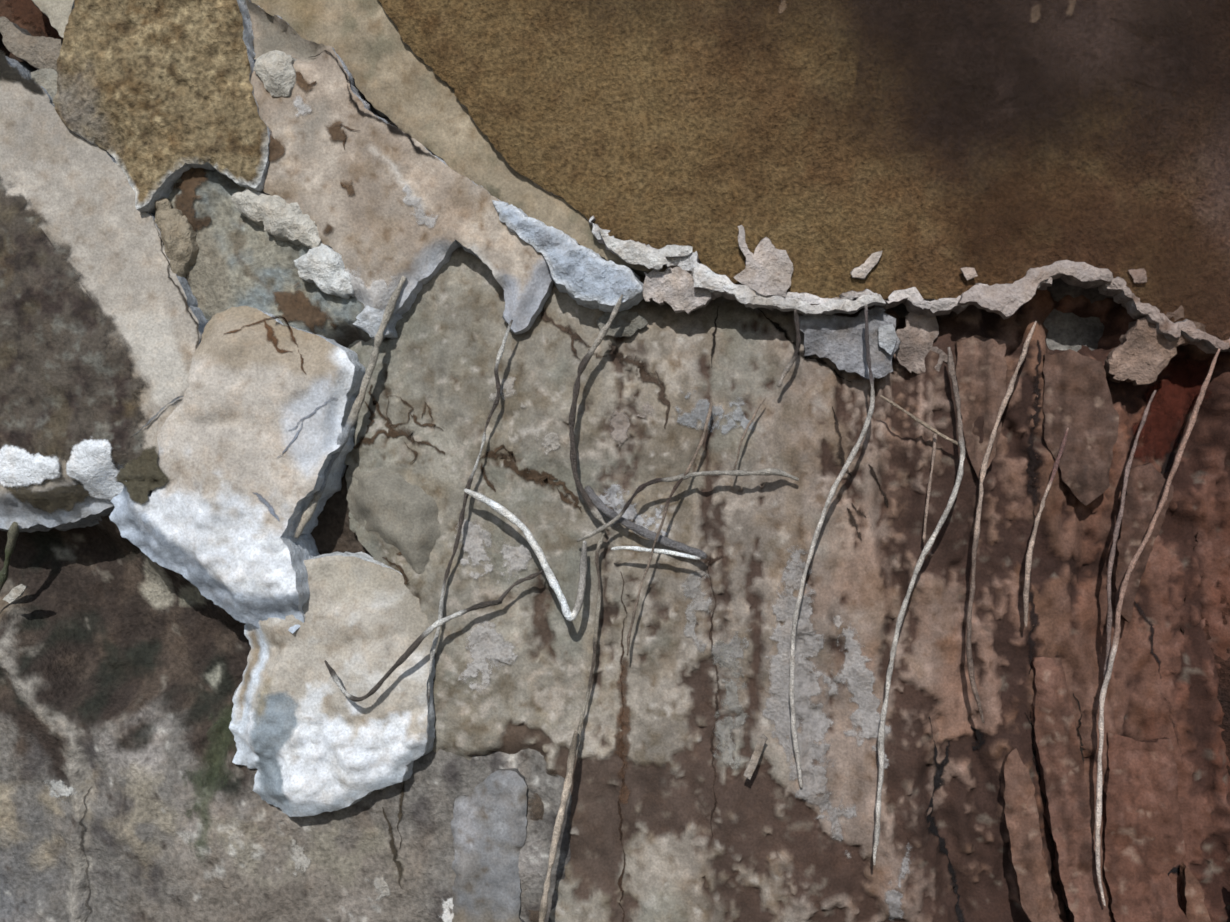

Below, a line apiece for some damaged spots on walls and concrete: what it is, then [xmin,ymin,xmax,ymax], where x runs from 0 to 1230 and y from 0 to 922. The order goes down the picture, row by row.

spalling [6,56,55,107]
spalling [331,46,397,126]
water stain [841,0,1221,164]
water stain [0,177,149,500]
spalling [176,274,209,344]
corrosion [541,308,670,428]
corrosion [1129,356,1209,463]
spalling [0,506,115,533]
spalling [294,209,1230,922]
corrosion [615,660,631,803]
water stain [50,780,73,797]
crack [382,781,404,888]